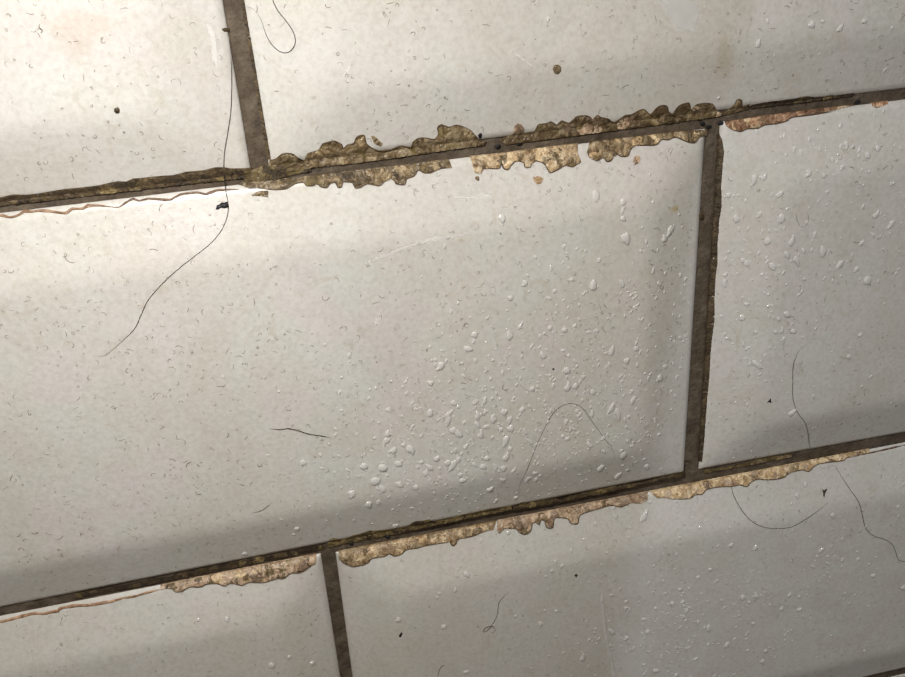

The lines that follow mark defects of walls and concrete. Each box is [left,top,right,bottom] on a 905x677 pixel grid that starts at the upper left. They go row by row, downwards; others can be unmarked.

spalling [237,99,853,197]
crack [0,189,239,218]
spalling [338,448,870,567]
spalling [160,553,317,593]
crack [0,589,160,623]